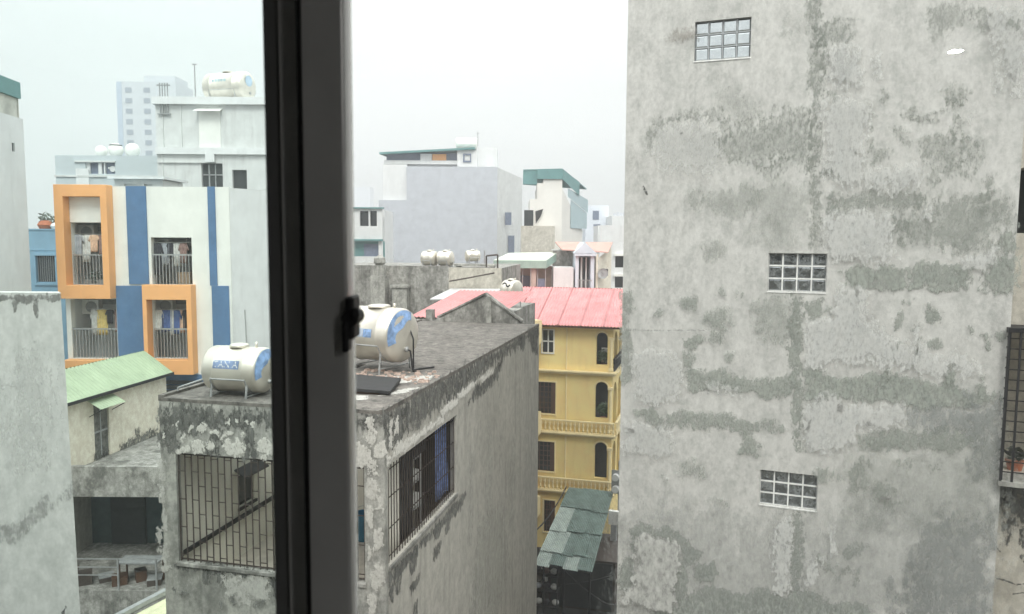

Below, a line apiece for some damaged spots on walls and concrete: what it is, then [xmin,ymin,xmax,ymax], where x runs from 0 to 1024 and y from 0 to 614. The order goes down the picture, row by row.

leakage [0,293,60,318]
leakage [119,402,272,463]
peeling [155,418,272,573]
peeling [357,368,495,614]
leakage [356,326,539,450]